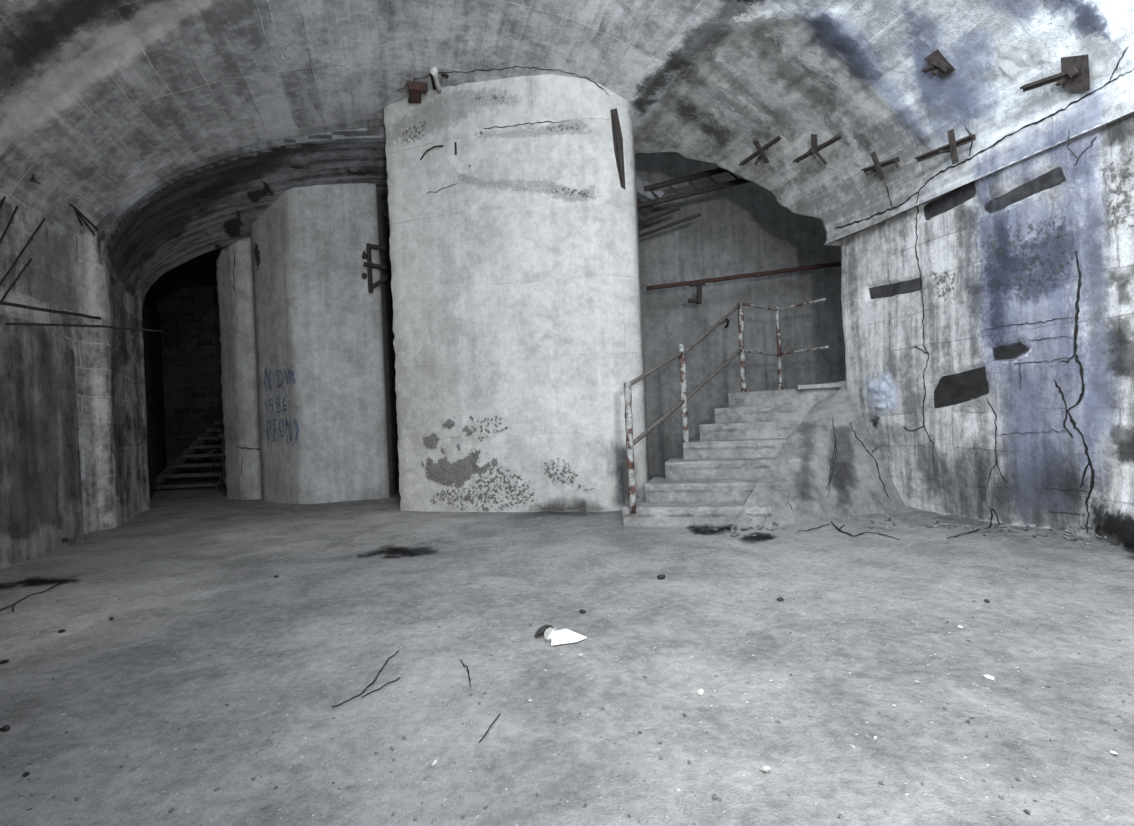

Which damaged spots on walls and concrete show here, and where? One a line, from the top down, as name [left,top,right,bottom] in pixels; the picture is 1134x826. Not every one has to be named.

crack [790,47,1133,540]
peeling [421,415,535,512]
peeling [540,458,596,491]